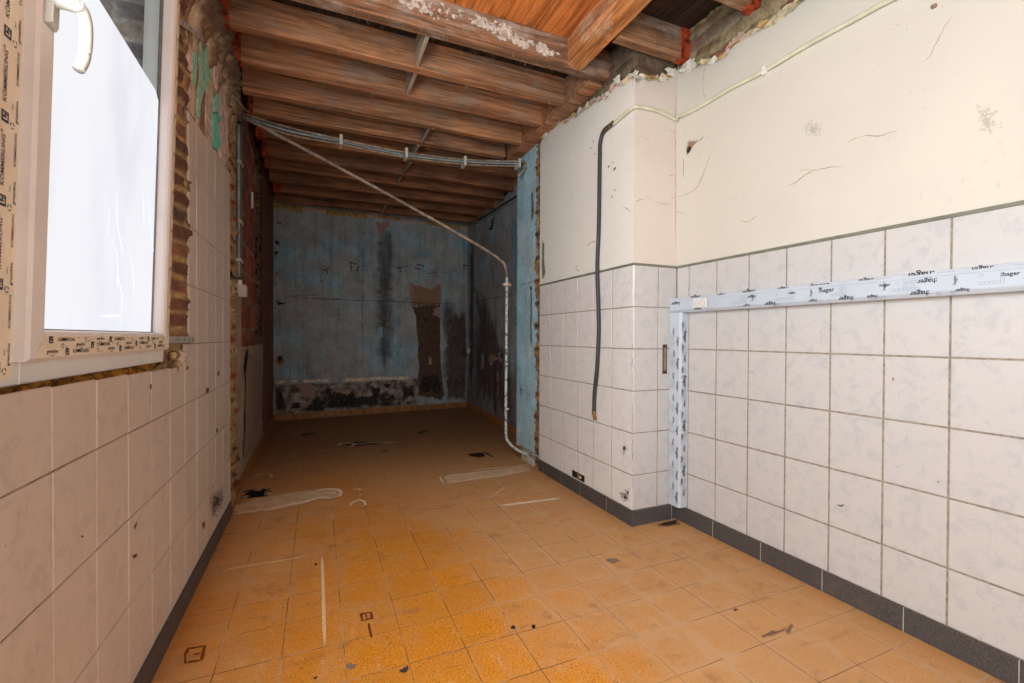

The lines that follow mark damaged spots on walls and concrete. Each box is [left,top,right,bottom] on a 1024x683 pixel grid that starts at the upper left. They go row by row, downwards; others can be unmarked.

water stain [391,0,560,57]
flaking render [540,0,803,141]
flaking render [153,0,228,370]
flaking render [255,145,517,345]
water stain [275,232,510,415]
flaking render [342,282,444,400]